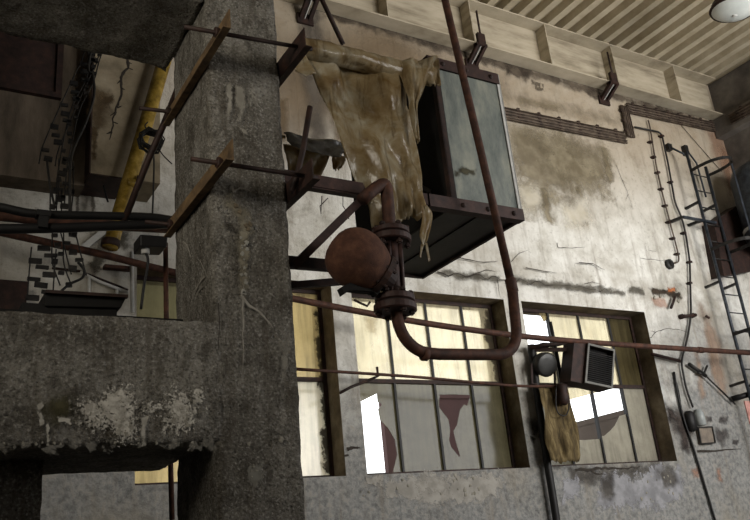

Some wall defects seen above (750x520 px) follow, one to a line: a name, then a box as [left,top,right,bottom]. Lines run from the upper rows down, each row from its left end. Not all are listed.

crack [106,59,133,140]
leakage [511,128,613,227]
crack [437,252,645,296]
peeling [65,381,208,448]